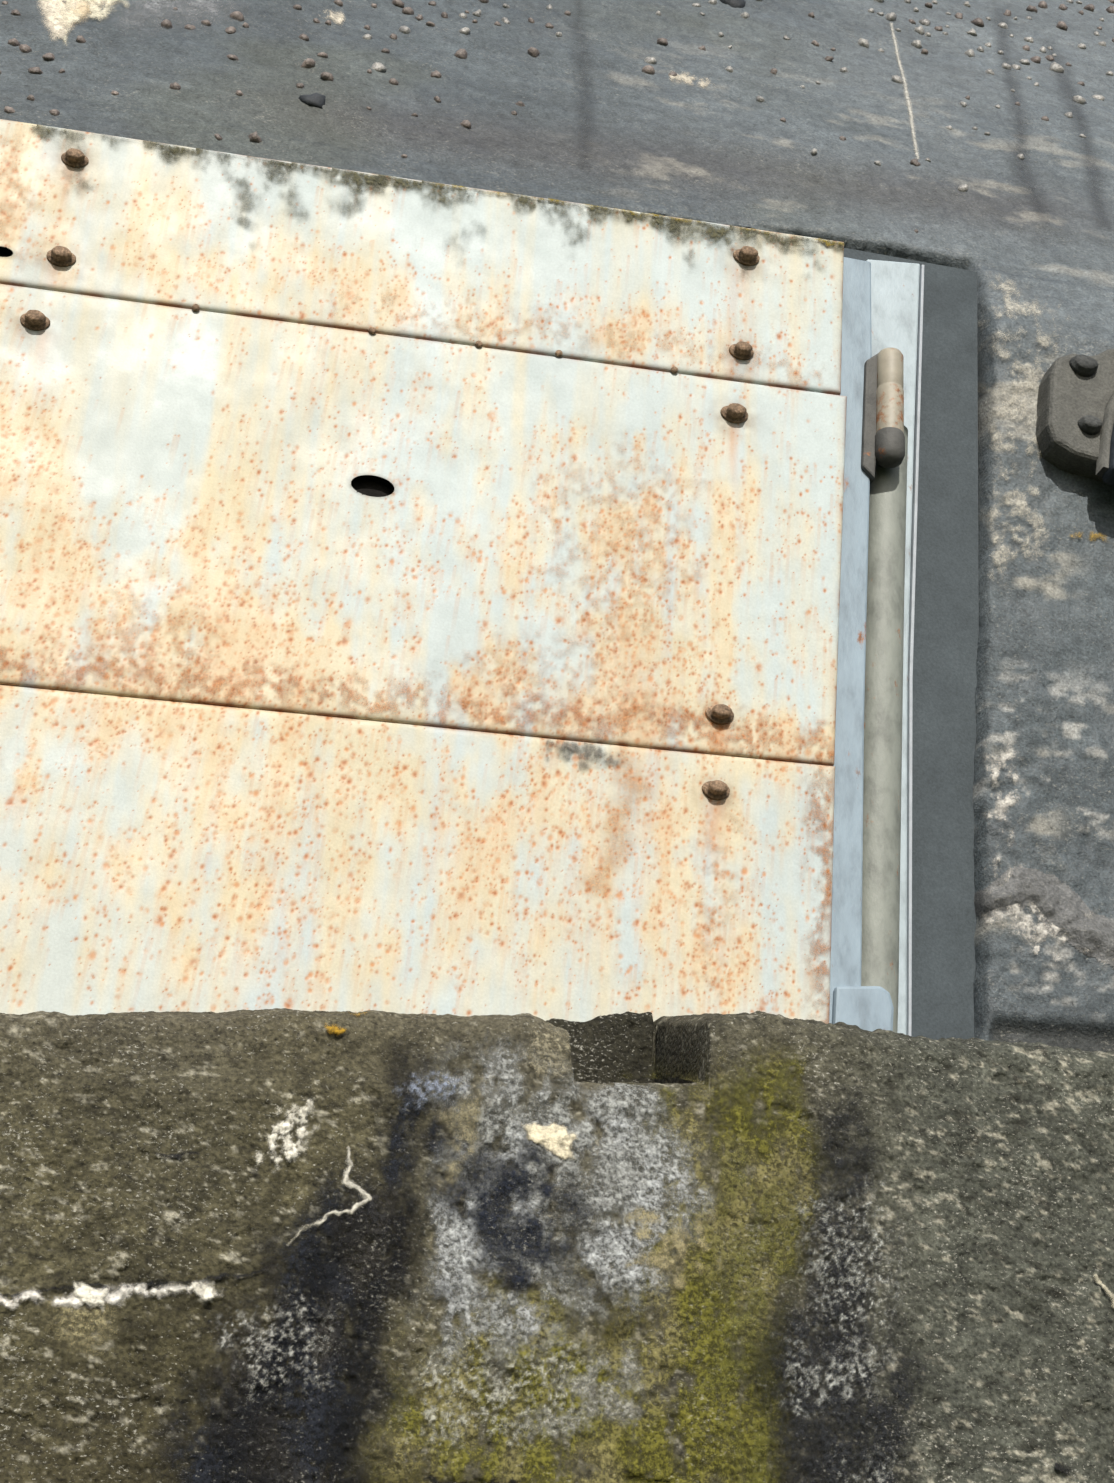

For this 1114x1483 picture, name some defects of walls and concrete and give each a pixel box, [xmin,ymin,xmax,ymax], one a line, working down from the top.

spalling [41,0,115,40]
crack [0,1147,372,1345]
leakage [162,1049,464,1483]
leakage [725,1100,920,1483]
leakage [423,1345,596,1443]